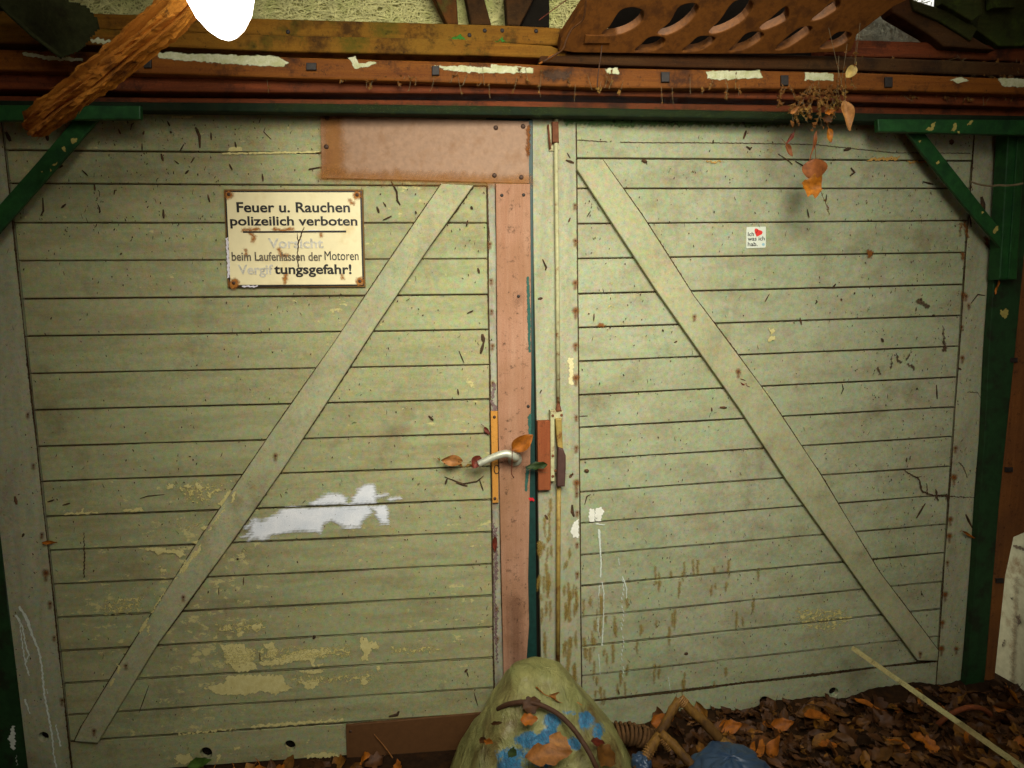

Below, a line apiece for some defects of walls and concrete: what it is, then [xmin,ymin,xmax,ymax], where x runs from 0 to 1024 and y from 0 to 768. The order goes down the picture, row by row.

peeling [103,482,236,636]
peeling [203,619,441,696]
rust [537,499,552,654]
rust [563,544,628,699]
crack [903,462,974,502]